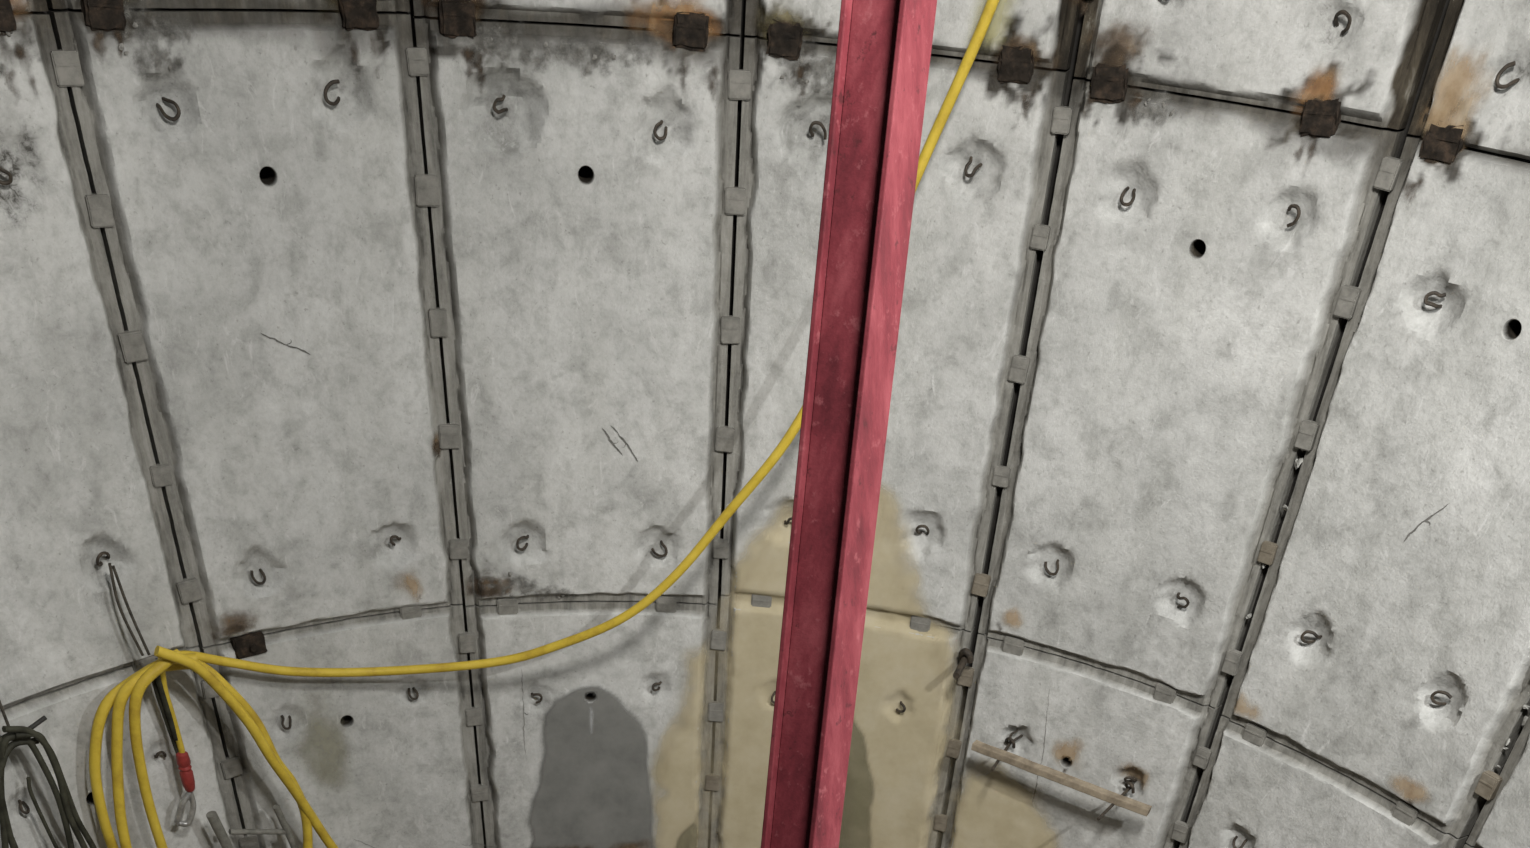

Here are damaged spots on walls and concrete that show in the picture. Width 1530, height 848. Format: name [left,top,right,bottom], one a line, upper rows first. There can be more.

corrosion [9,47,26,80]
corrosion [635,1,719,36]
corrosion [1097,25,1136,65]
corrosion [1298,73,1335,107]
corrosion [1424,58,1473,136]
corrosion [471,578,511,597]
damp [719,508,793,848]
damp [839,488,953,848]
damp [530,652,705,848]
damp [951,772,1056,848]